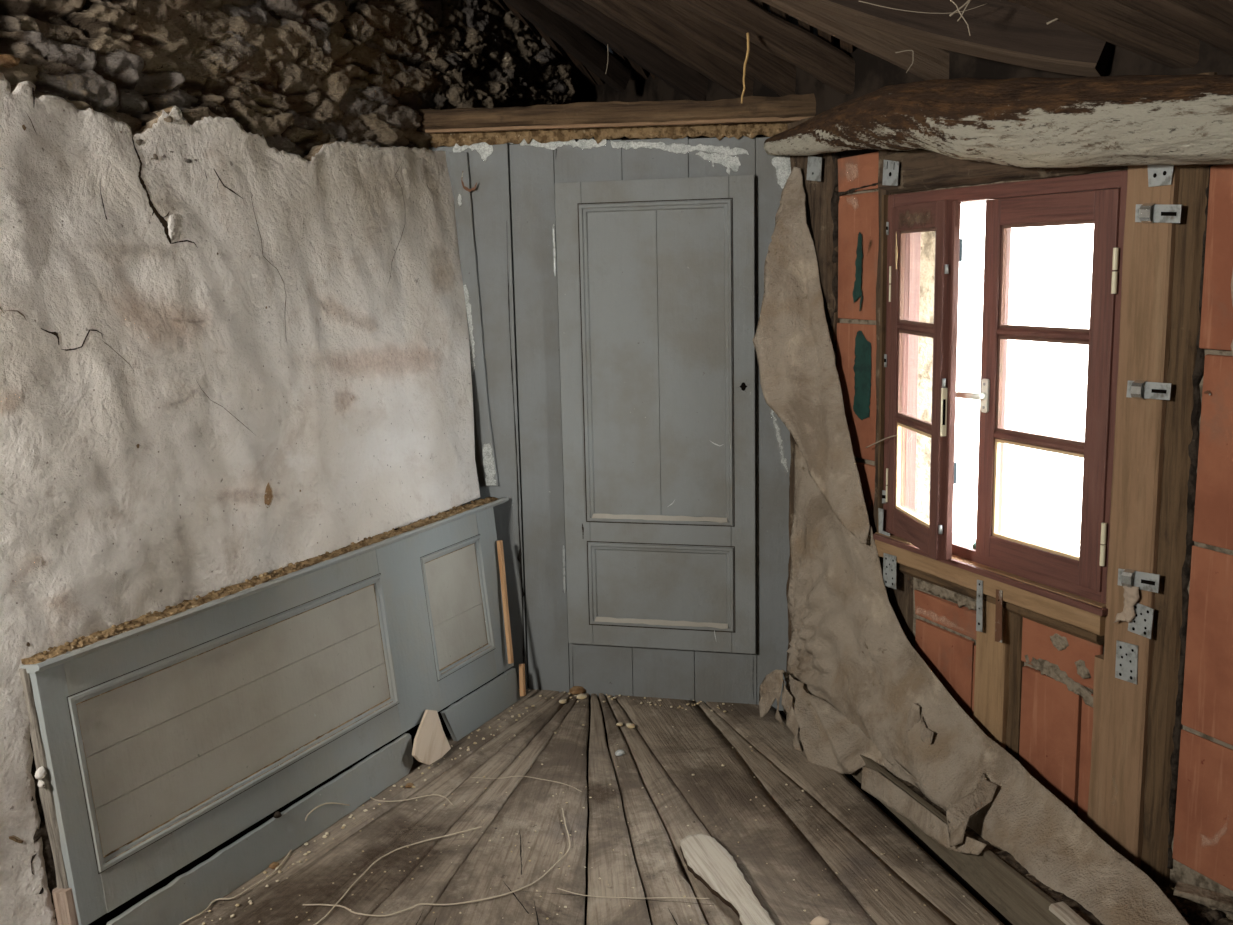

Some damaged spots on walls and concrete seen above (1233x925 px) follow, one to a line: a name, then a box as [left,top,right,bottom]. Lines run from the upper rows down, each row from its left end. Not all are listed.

peeling [453,142,493,162]
peeling [511,139,749,174]
crack [132,137,198,248]
crack [0,307,133,369]